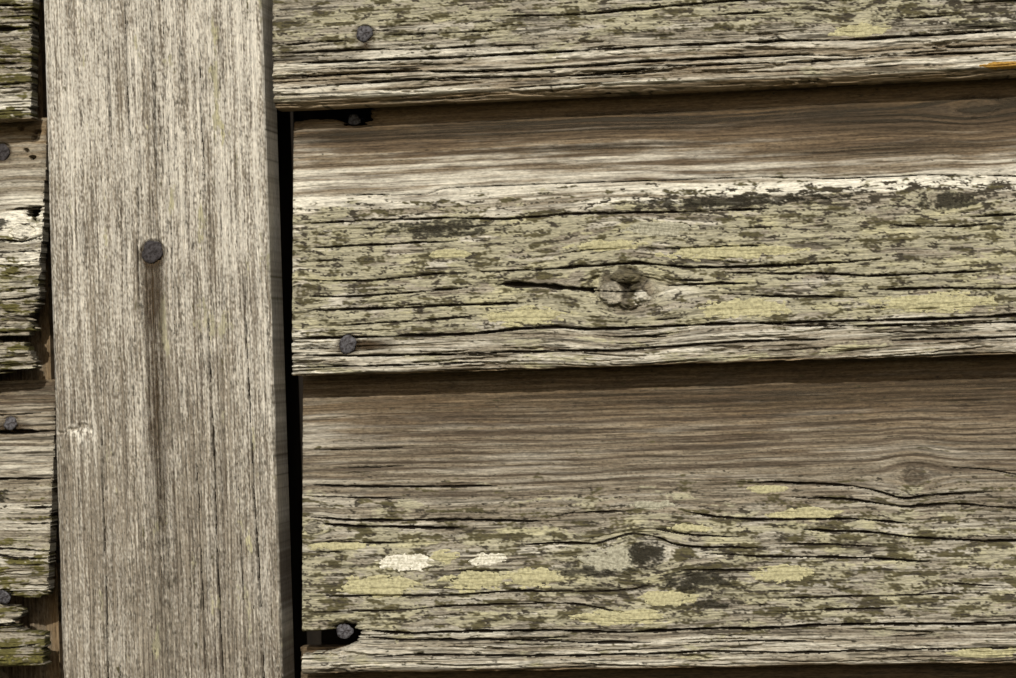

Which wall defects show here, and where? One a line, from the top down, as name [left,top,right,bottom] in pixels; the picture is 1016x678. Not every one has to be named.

crack [299,174,1016,368]
crack [309,447,1016,657]